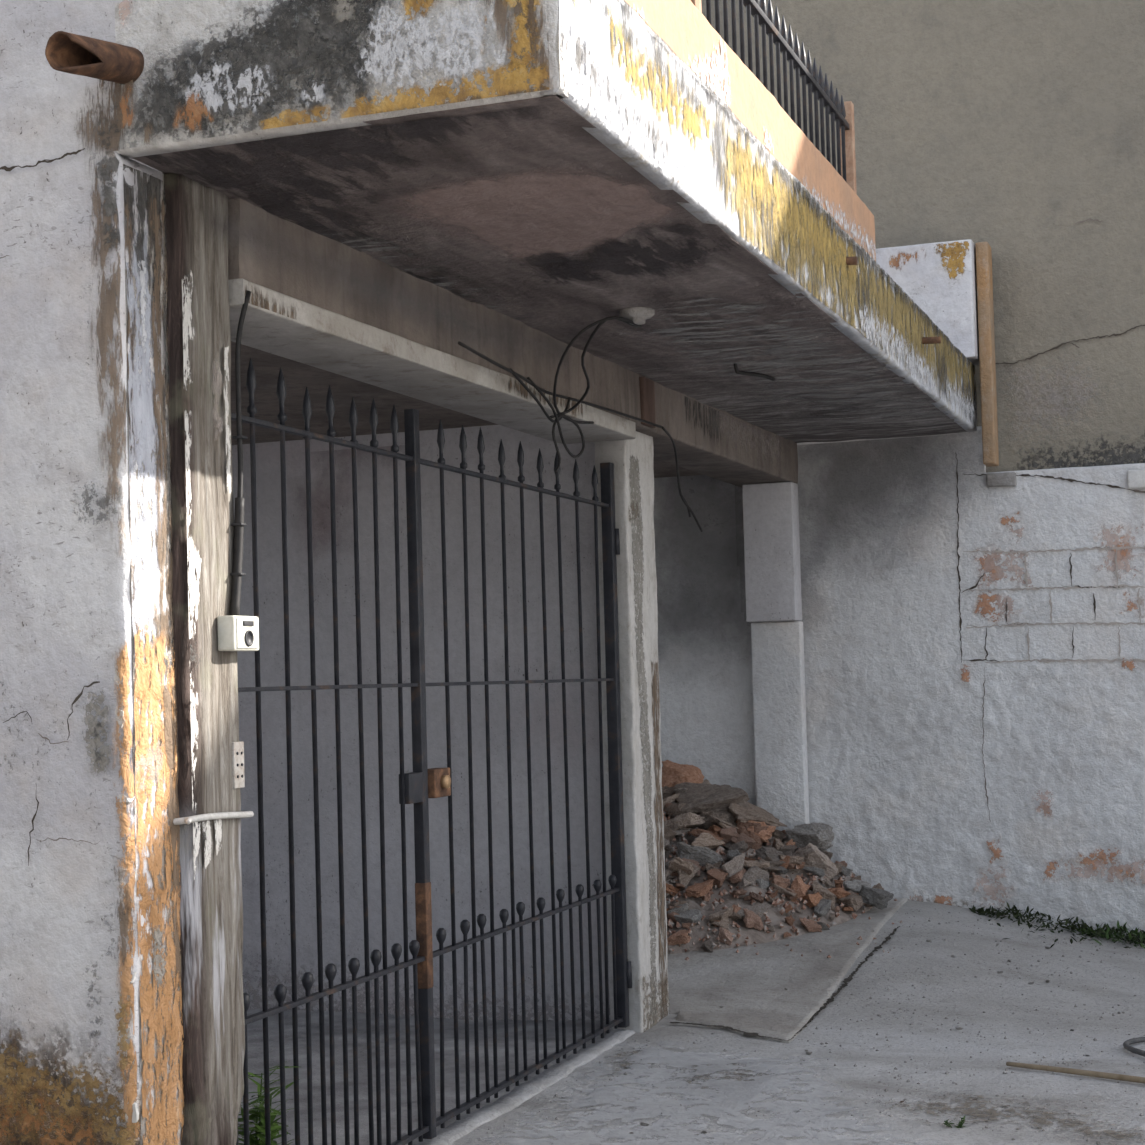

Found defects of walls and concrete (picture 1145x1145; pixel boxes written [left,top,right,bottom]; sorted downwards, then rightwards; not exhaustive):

crack [0,148,85,171]
leakage [577,0,977,423]
leakage [74,0,399,674]
crack [995,325,1145,364]
flaking render [1001,512,1022,537]
flaking render [974,553,1031,622]
crack [3,711,68,744]
crack [28,785,99,866]
flaking render [1043,848,1145,883]
leakage [0,1032,140,1145]
peeling [123,1101,139,1123]